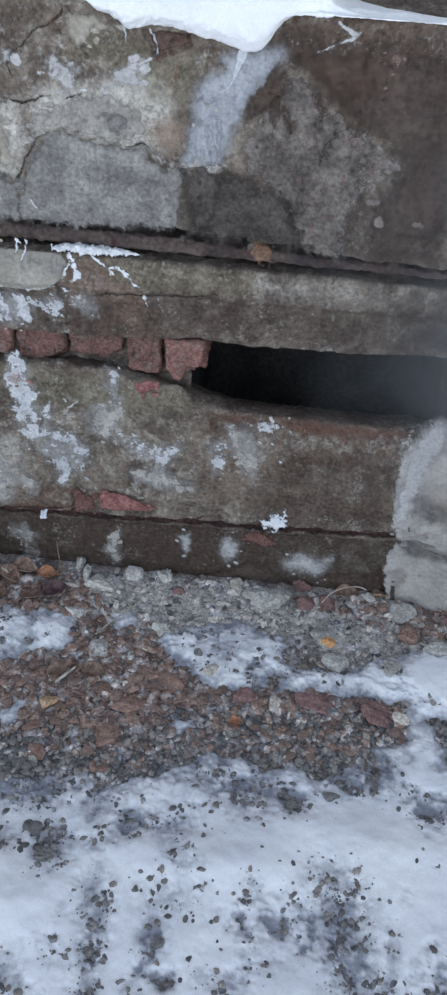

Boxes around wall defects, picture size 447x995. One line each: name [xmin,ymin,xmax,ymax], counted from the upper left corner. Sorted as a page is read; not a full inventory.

crack [15,135,44,181]
crack [3,4,81,108]
damp [151,47,296,167]
damp [305,46,447,279]
damp [0,460,34,500]
damp [4,350,89,484]
damp [211,417,292,474]
damp [0,526,385,593]